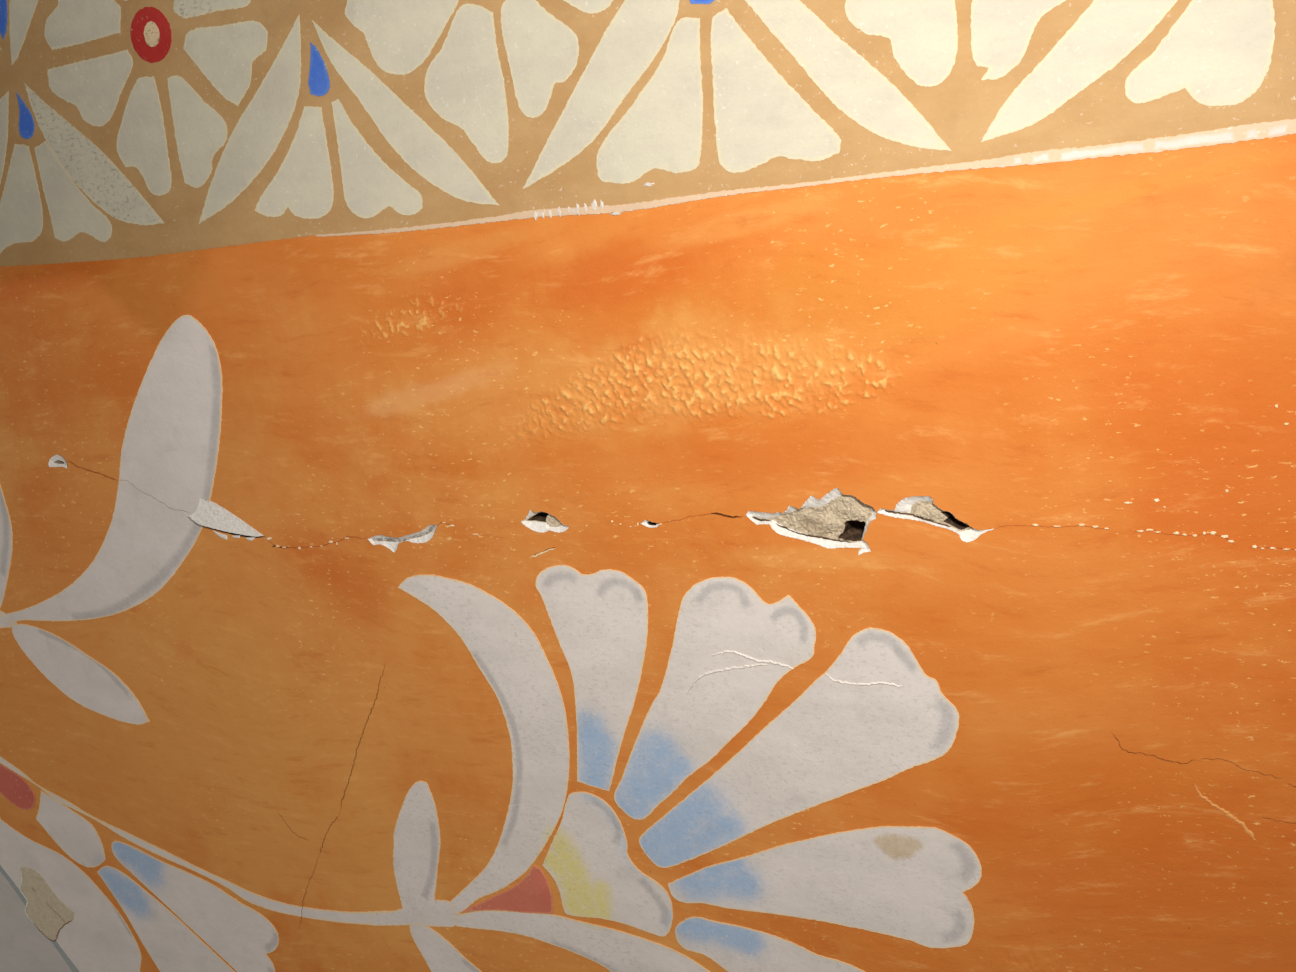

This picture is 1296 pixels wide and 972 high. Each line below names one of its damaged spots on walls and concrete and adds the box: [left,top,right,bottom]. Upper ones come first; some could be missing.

flaking render [48,454,68,469]
crack [69,461,187,512]
flaking render [189,499,269,541]
crack [269,536,365,550]
flaking render [368,525,437,553]
flaking render [521,510,569,533]
crack [585,512,742,527]
flaking render [746,488,994,555]
crack [1001,499,1296,551]
crack [280,662,386,930]
crack [1114,735,1296,841]